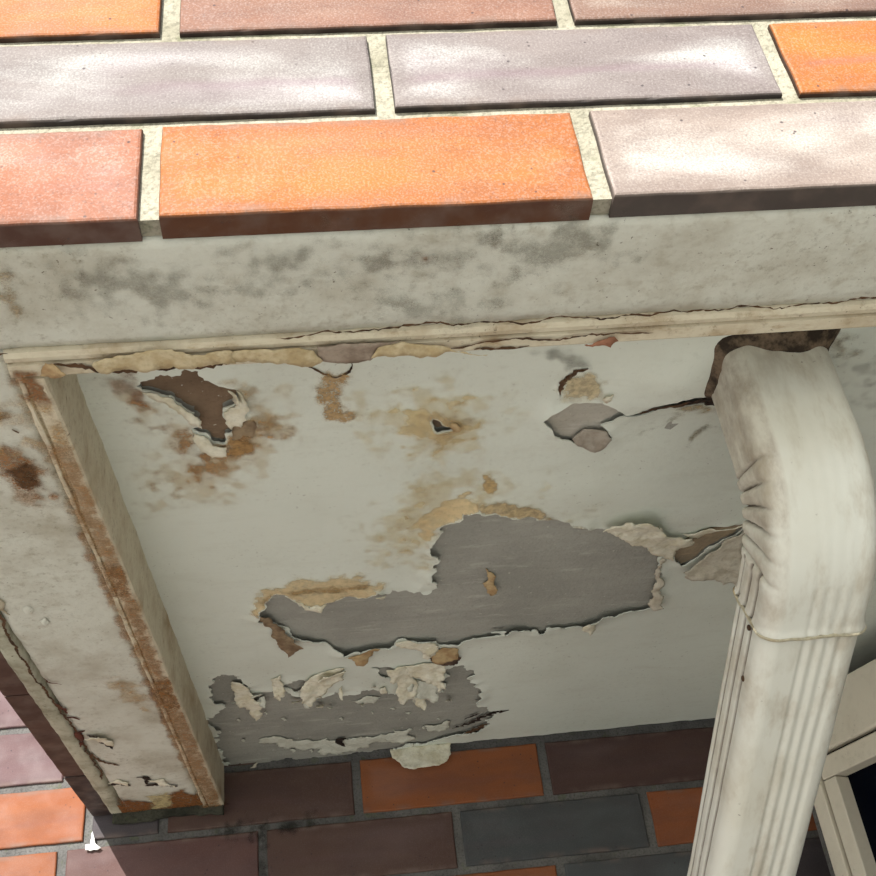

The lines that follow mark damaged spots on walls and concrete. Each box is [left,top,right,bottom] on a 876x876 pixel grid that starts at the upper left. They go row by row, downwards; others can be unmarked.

crack [281,297,876,400]
spalling [585,337,618,348]
corrosion [11,372,50,415]
peeling [40,340,528,458]
peeling [546,395,619,453]
crack [640,398,714,414]
corrosion [0,446,57,504]
water stain [414,475,551,541]
corrosion [26,427,228,813]
peeling [208,514,745,769]
crack [0,614,177,787]